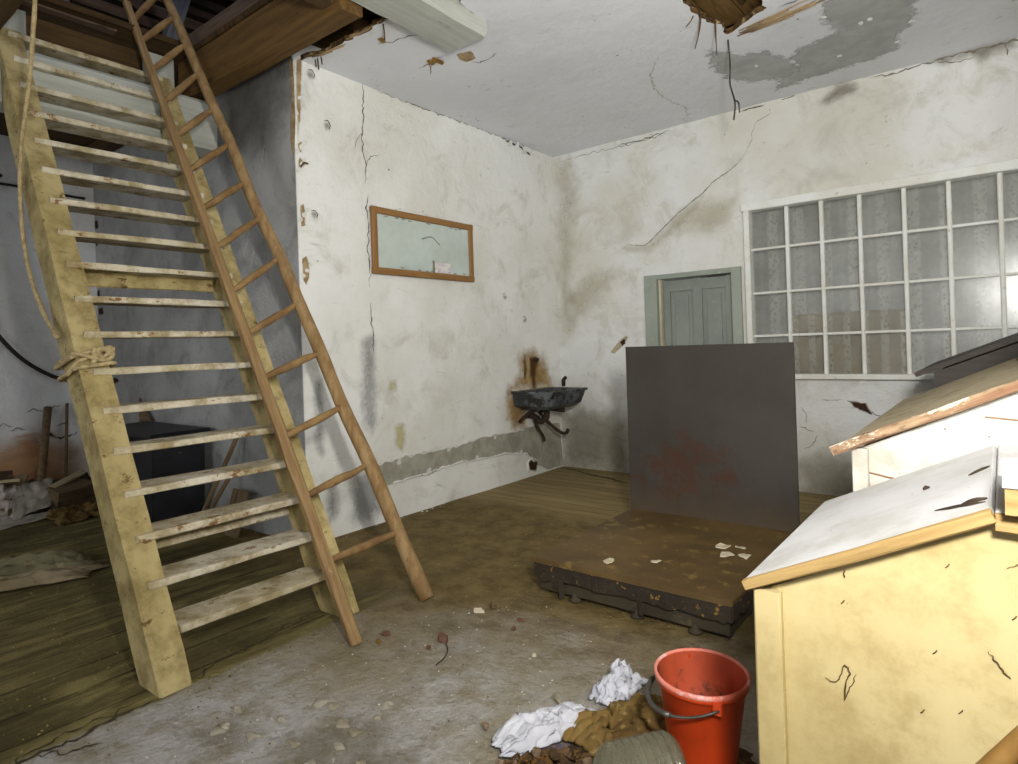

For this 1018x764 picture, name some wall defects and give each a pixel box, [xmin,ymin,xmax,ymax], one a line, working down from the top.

peeling [685,0,916,88]
crack [354,86,534,359]
corrosion [516,353,549,388]
corrosion [508,398,525,426]
spalling [378,423,564,485]